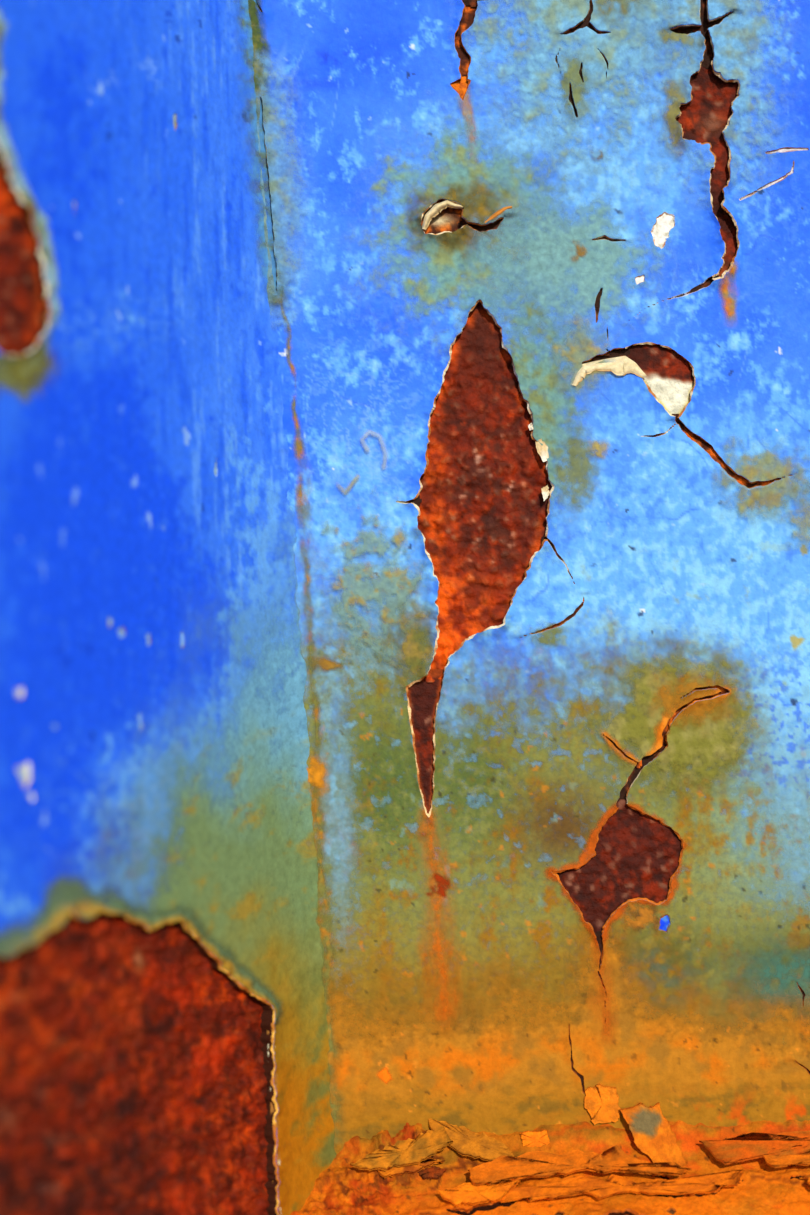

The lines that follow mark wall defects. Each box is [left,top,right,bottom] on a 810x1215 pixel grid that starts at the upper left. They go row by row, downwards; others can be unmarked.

crack [544,0,619,129]
peeling [0,0,63,356]
peeling [570,0,756,421]
rust [281,303,294,373]
rust [292,400,303,459]
rust [297,478,308,518]
peeling [391,295,572,817]
rust [302,547,810,1207]
crack [595,931,607,1023]
peeling [0,888,281,1215]
crack [569,1025,585,1093]
crack [414,1126,810,1215]